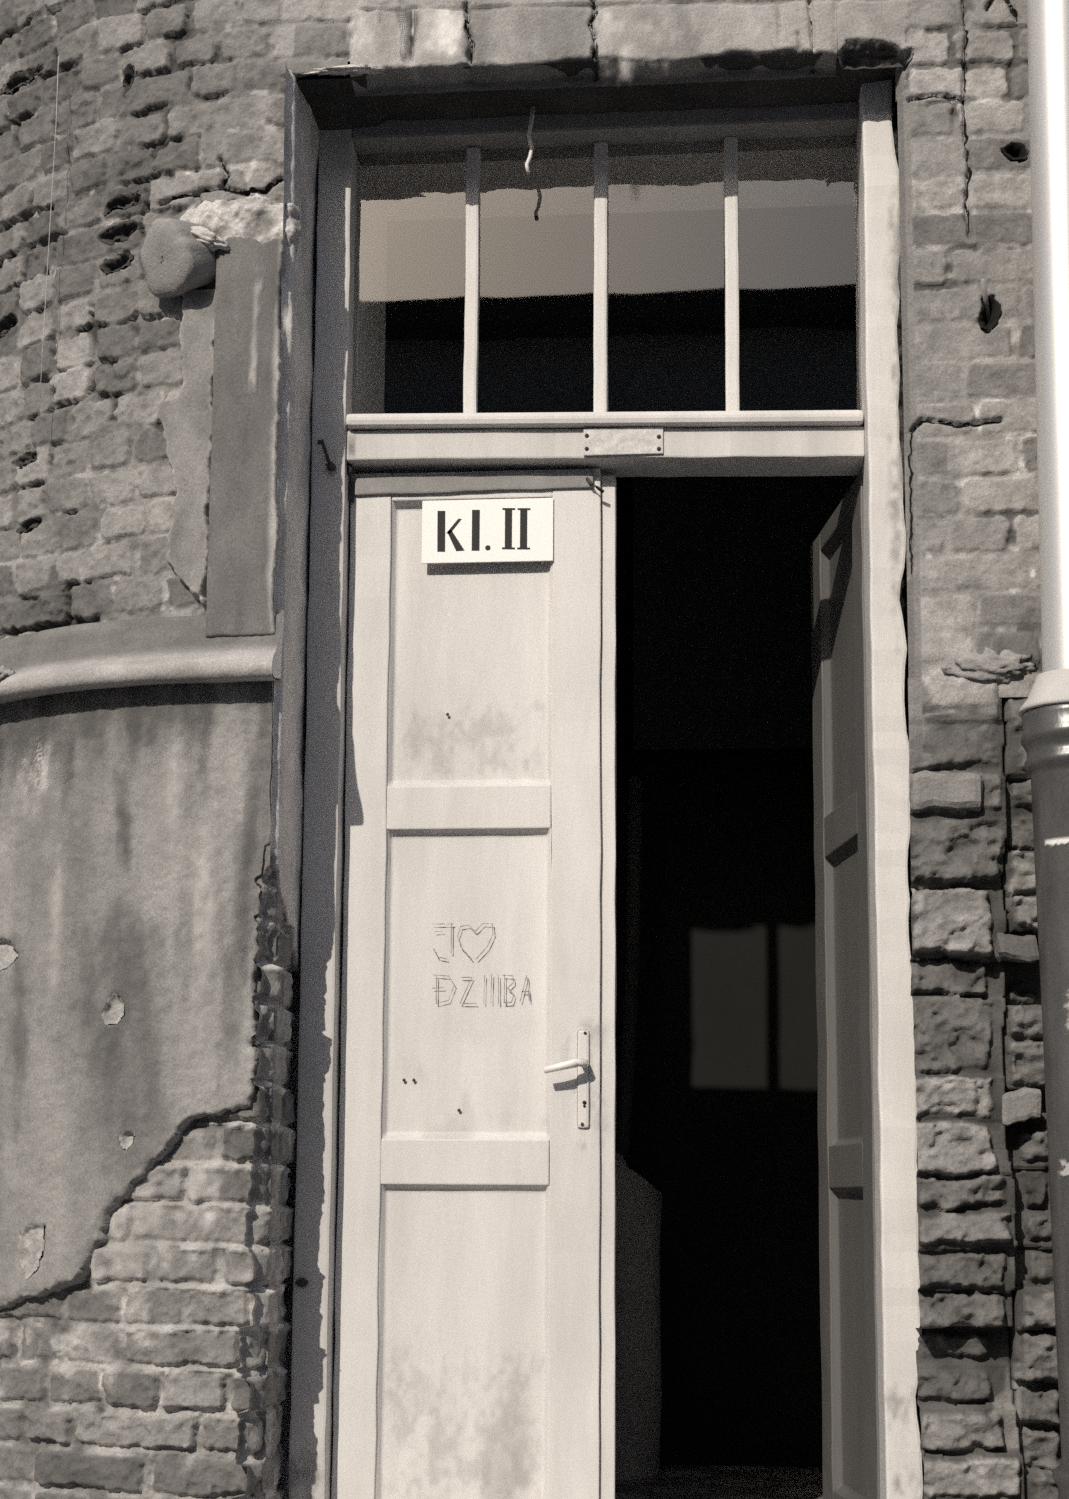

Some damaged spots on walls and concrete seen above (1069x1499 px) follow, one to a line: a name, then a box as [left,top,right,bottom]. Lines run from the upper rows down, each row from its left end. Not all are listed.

crack [464,9,475,64]
crack [588,2,598,68]
crack [911,0,1018,235]
spalling [1000,141,1027,160]
spalling [979,296,1001,332]
damp [0,696,50,794]
damp [163,751,187,834]
damp [47,863,63,989]
damp [192,851,216,1033]
flaking render [101,992,124,1025]
spalling [908,676,1062,1499]
flaking render [0,1073,274,1499]